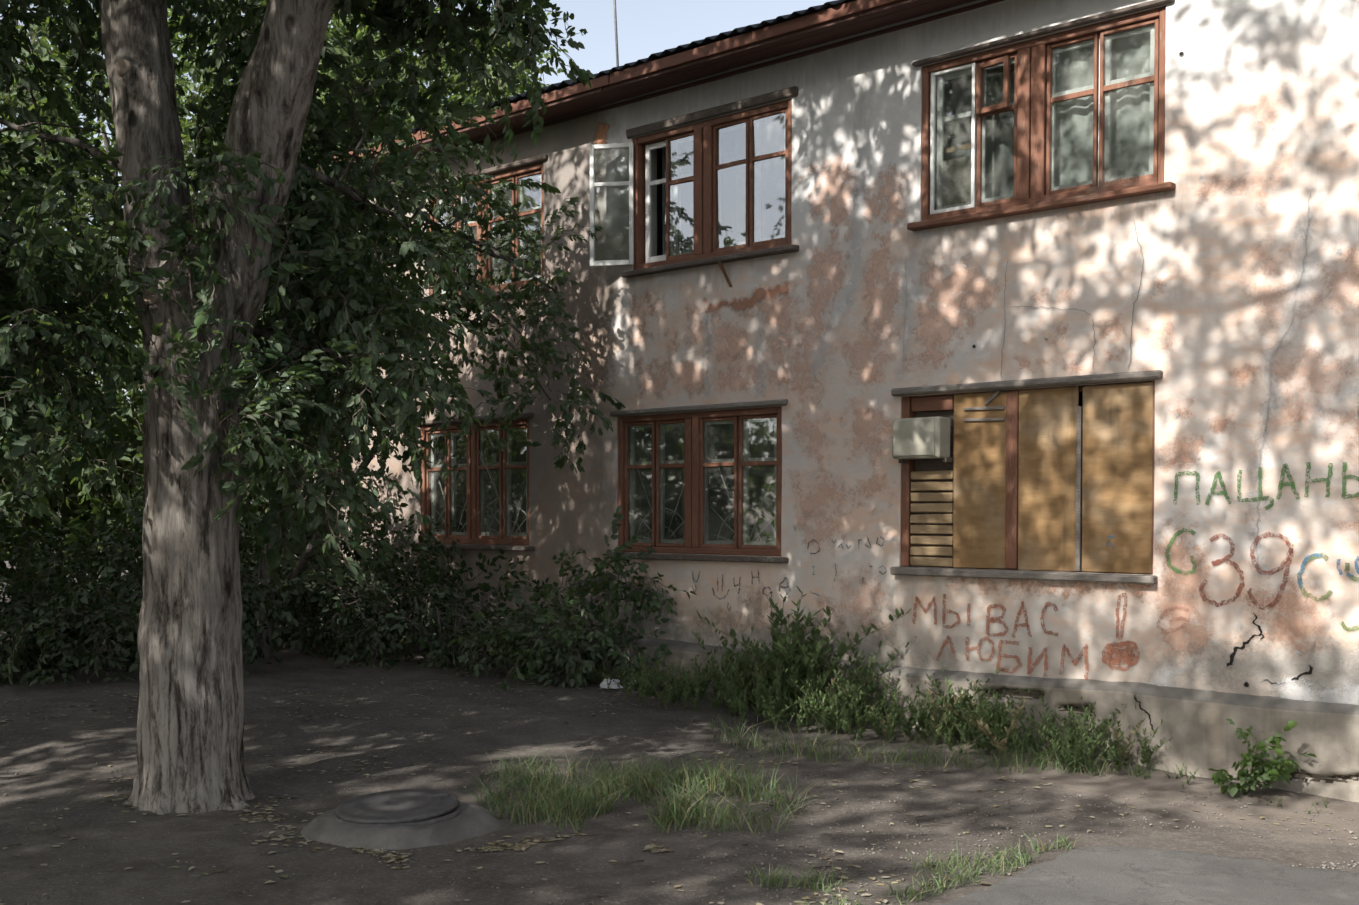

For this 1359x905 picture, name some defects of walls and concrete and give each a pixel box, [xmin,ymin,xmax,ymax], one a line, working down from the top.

peeling [628,158,996,397]
crack [1001,258,1096,378]
crack [1128,218,1144,370]
crack [1256,193,1311,575]
crack [1225,612,1265,667]
crack [1262,638,1346,685]